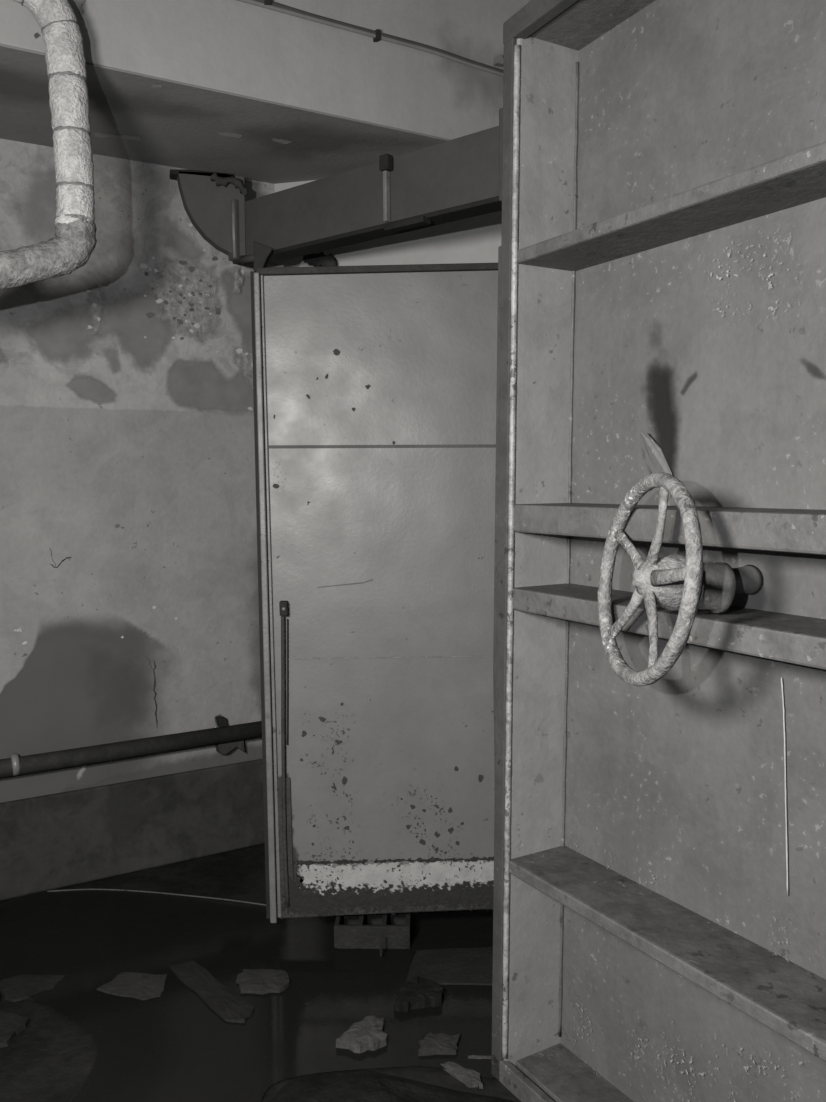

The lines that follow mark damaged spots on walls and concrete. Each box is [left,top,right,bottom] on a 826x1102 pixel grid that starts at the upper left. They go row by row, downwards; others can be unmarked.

peeling [140,249,220,342]